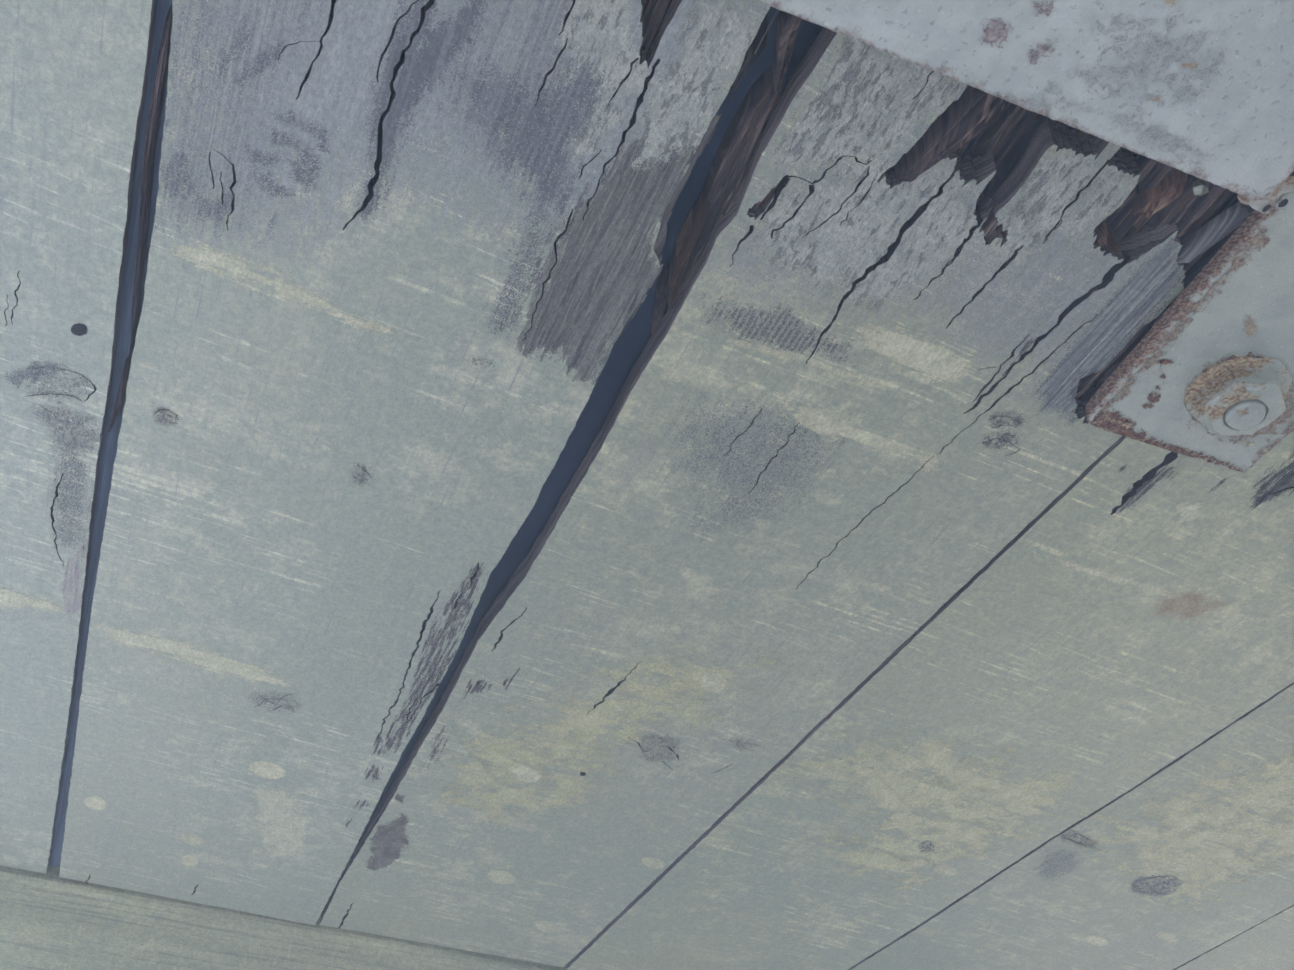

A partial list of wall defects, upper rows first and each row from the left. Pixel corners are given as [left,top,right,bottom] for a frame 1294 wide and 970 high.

damp [3,359,67,389]
crack [278,0,337,100]
crack [343,0,435,230]
damp [350,0,616,339]
crack [730,156,876,266]
crack [806,172,954,363]
crack [796,251,1131,589]
crack [946,159,1110,329]
peeling [989,149,1140,266]
peeling [993,11,1231,196]
corrosion [1090,224,1294,471]
crack [378,563,479,740]